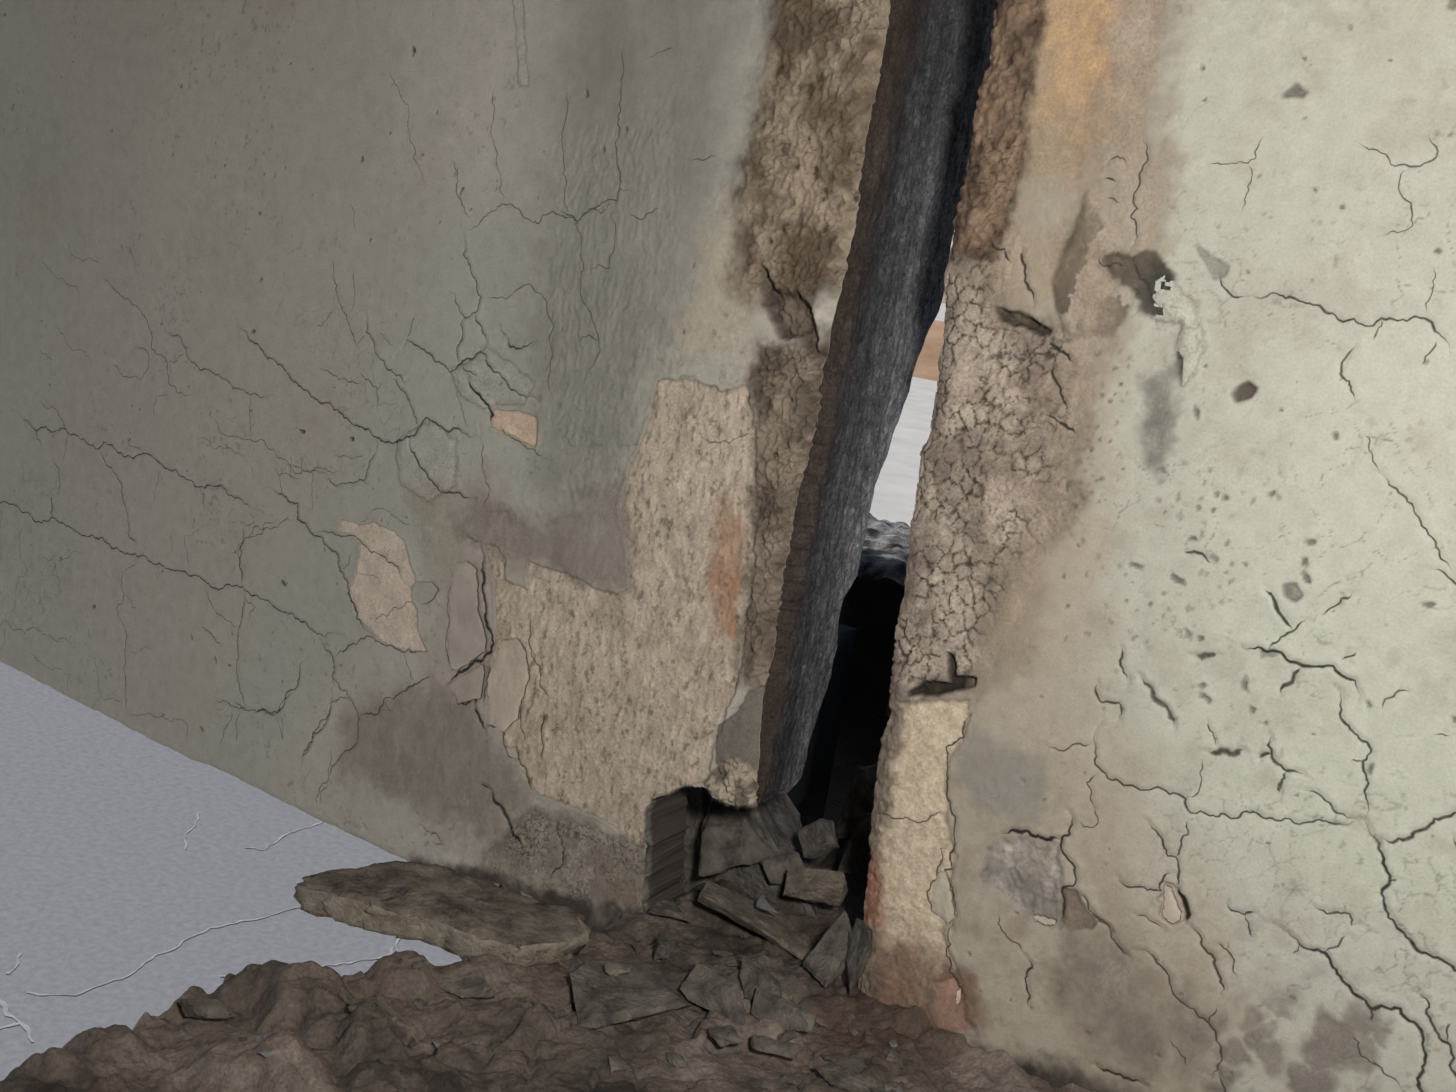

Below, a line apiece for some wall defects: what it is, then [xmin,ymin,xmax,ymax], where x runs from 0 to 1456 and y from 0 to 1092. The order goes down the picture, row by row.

rust [1030,0,1121,186]
crack [0,64,654,911]
peeling [340,0,890,848]
spalling [858,0,1097,1029]
crack [992,245,1034,298]
rust [992,178,1069,294]
crack [1048,343,1075,432]
crack [1099,147,1157,304]
crack [1220,273,1440,395]
crack [1366,143,1439,233]
crack [1368,437,1456,585]
crack [1008,592,1456,1092]